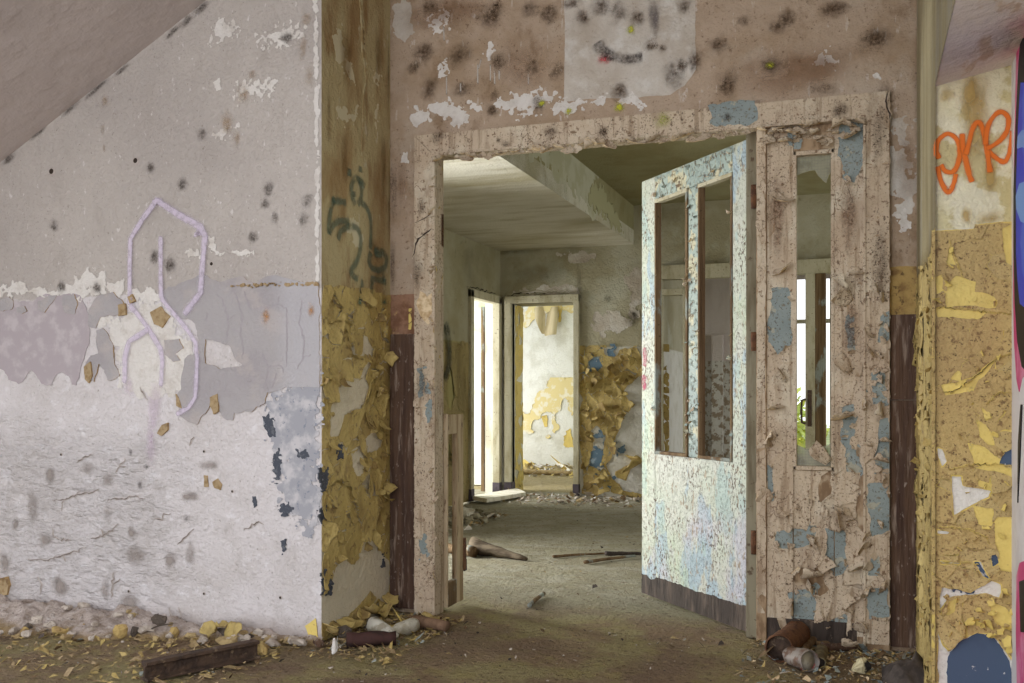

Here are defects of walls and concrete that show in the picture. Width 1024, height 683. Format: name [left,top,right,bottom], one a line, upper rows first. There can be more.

peeling [305,585,399,640]
peeling [0,0,758,612]
damp [477,57,502,114]
peeling [756,61,1014,683]